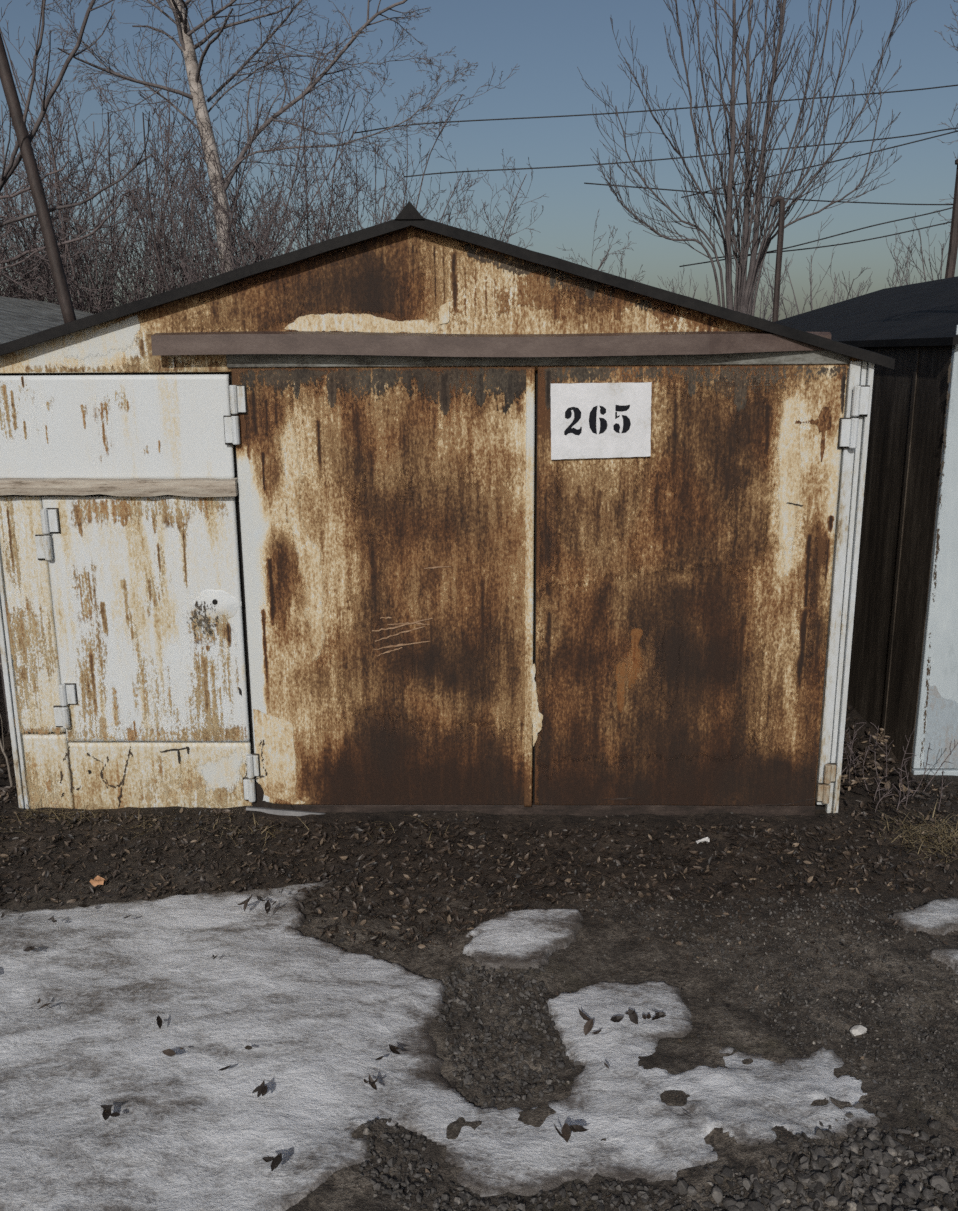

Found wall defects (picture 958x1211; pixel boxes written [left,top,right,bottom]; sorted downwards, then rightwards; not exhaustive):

rust [175,229,638,332]
rust [651,309,721,332]
rust [80,392,129,453]
rust [0,330,232,440]
rust [0,498,246,741]
rust [244,370,834,806]
peeling [530,664,543,746]
rust [22,752,67,809]
rust [139,757,244,808]